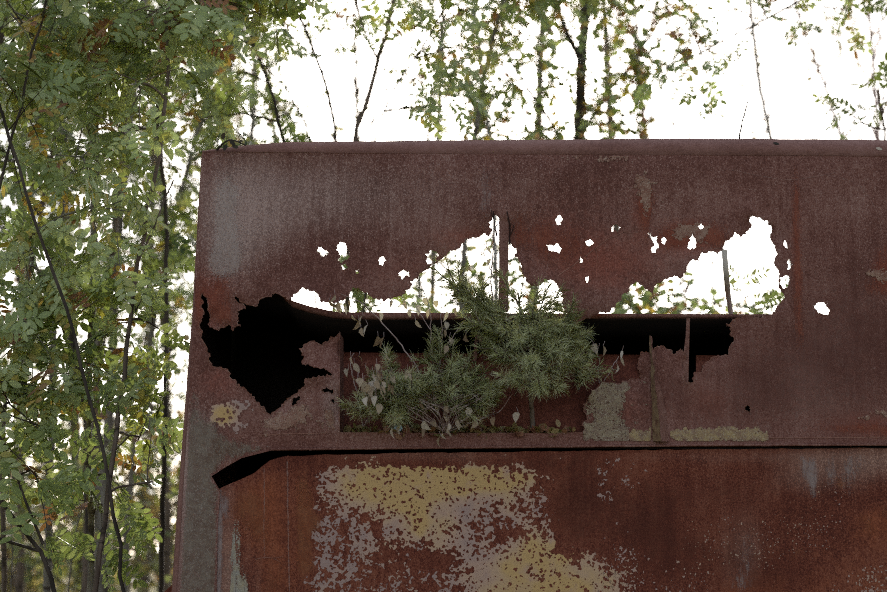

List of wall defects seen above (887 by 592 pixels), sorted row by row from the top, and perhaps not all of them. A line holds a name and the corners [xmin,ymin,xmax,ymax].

corrosion [511,217,578,260]
corrosion [658,223,728,250]
peeling [207,400,254,434]
peeling [304,454,781,592]
peeling [847,565,887,592]